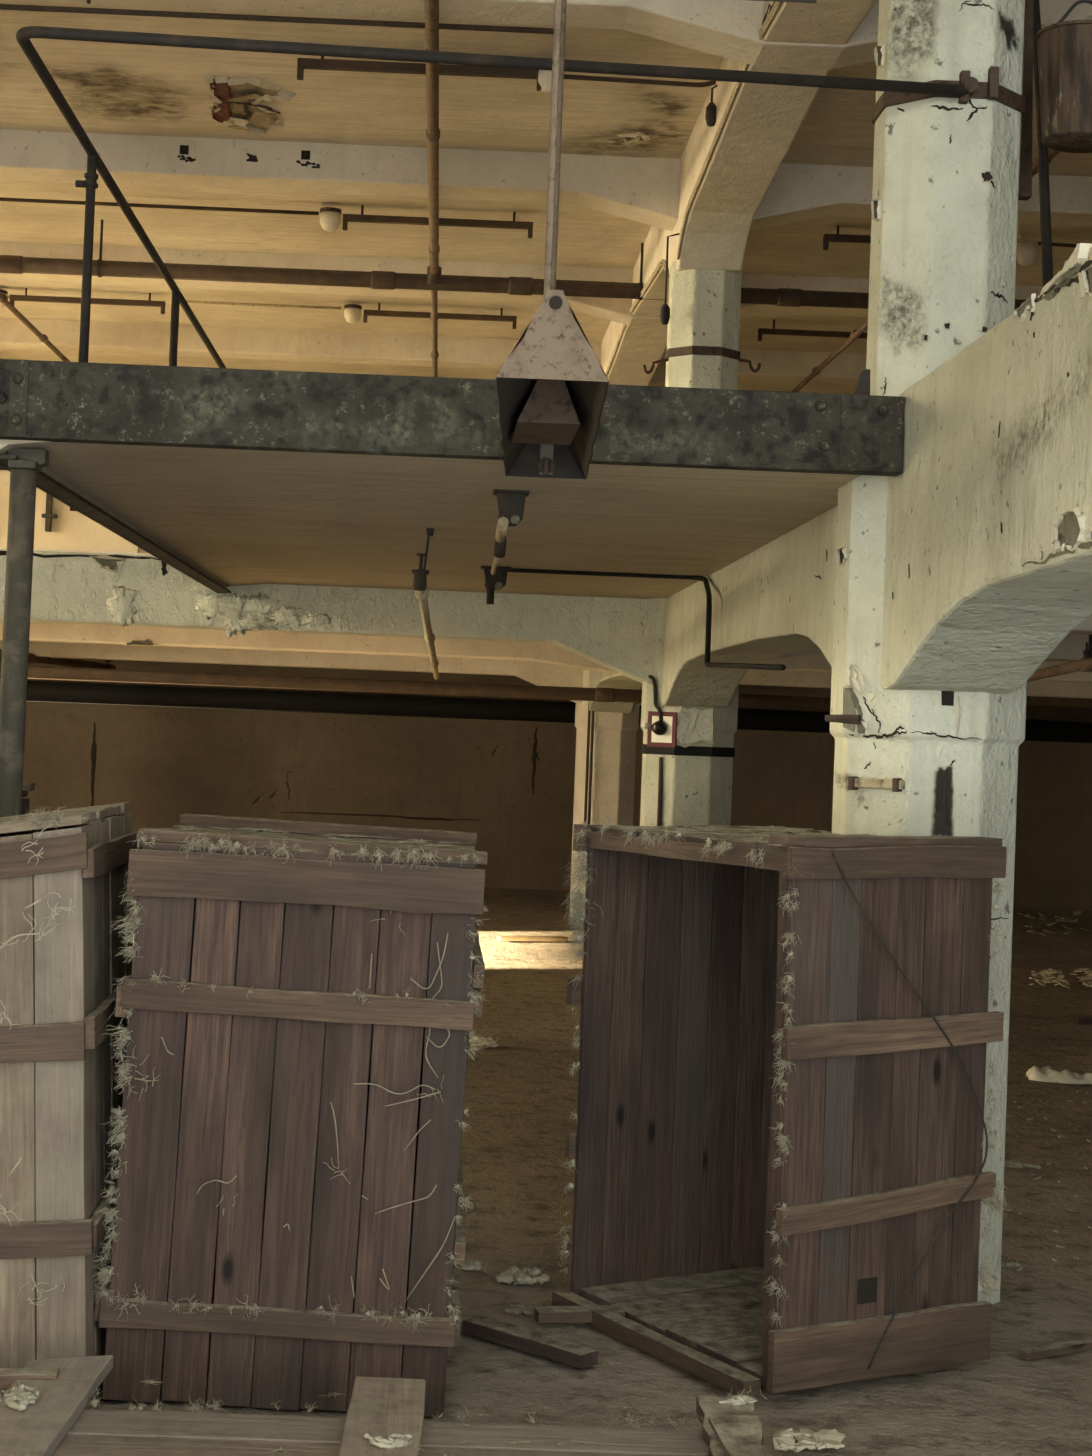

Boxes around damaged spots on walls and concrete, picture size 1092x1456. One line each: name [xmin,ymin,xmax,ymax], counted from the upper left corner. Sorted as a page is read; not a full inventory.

leakage [62,74,178,114]
spalling [203,74,296,135]
spalling [1013,243,1092,338]
crack [1022,541,1092,567]
crack [849,696,981,769]